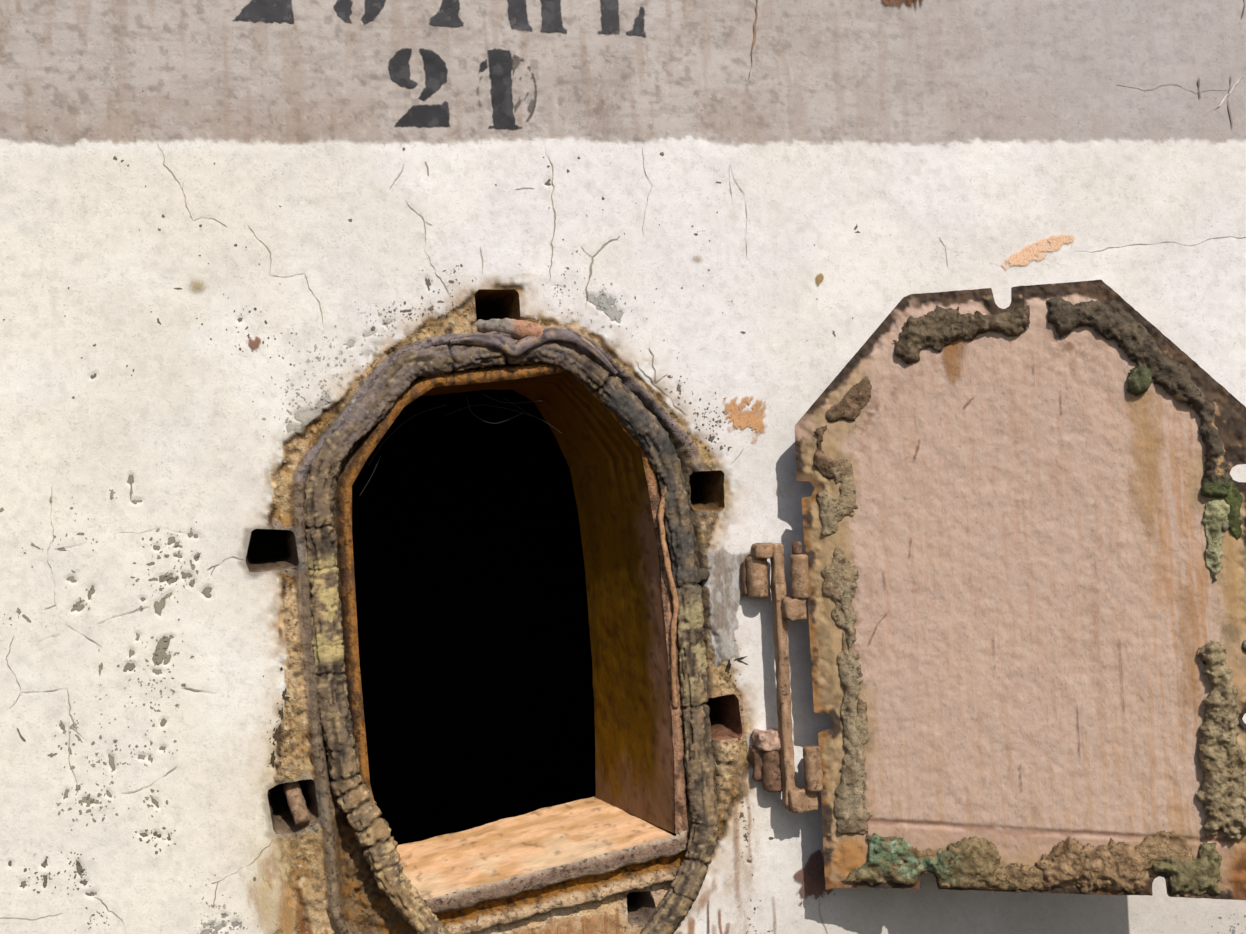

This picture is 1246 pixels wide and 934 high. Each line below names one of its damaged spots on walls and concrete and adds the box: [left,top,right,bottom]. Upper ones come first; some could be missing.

corrosion [882,0,922,8]
crack [157,143,324,327]
crack [405,200,449,293]
crack [544,145,653,304]
peeling [651,375,766,453]
peeling [131,521,212,616]
crack [6,636,86,786]
peeling [47,619,194,831]
peeling [8,852,109,931]
corrosion [251,843,312,934]
corrosion [677,886,729,934]
corrosion [794,850,835,905]